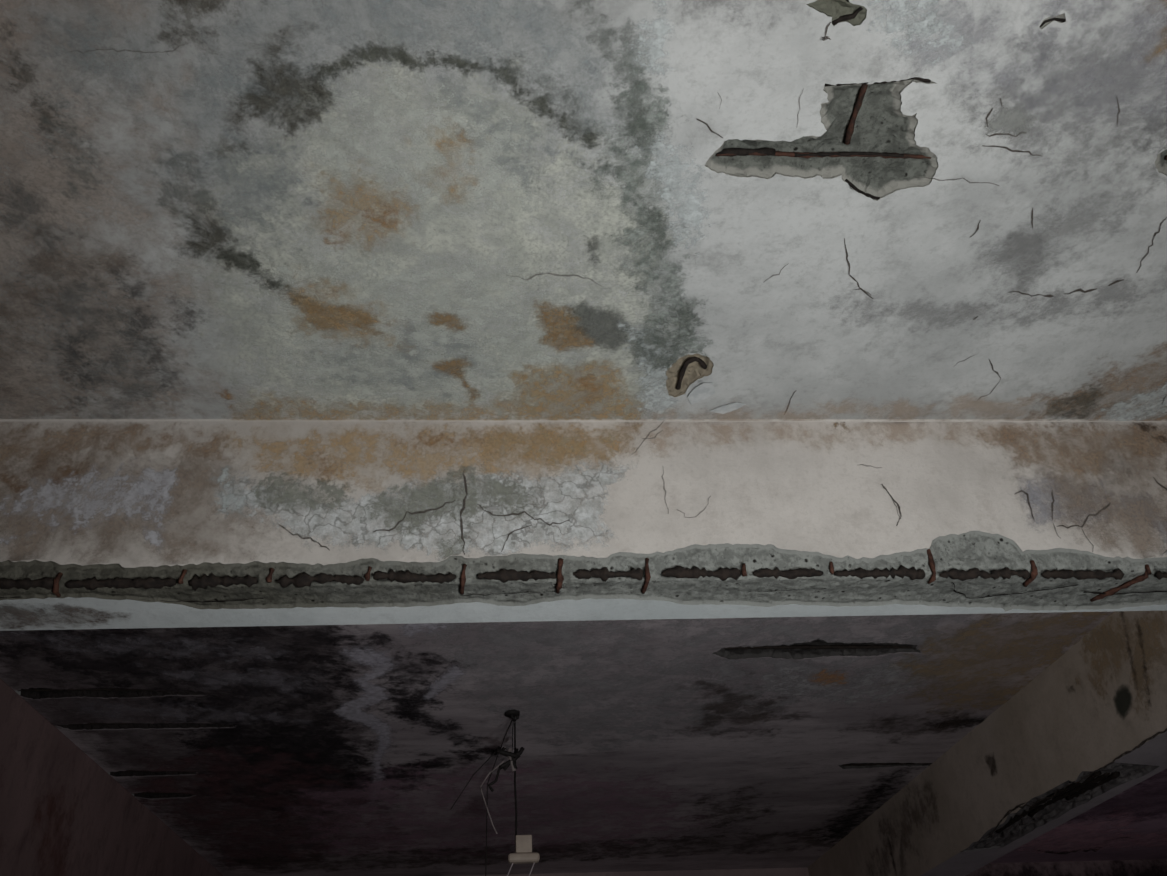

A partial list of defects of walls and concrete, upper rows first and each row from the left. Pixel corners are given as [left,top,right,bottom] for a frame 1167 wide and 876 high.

water stain [0,0,195,419]
water stain [161,0,659,420]
spalling [537,0,939,421]
spalling [1154,149,1167,176]
rust [289,286,380,335]
rust [430,312,463,330]
crack [844,238,873,299]
rust [0,424,221,492]
spalling [0,463,1167,611]
spalling [713,639,921,660]
water stain [1083,612,1164,718]
water stain [0,605,999,873]